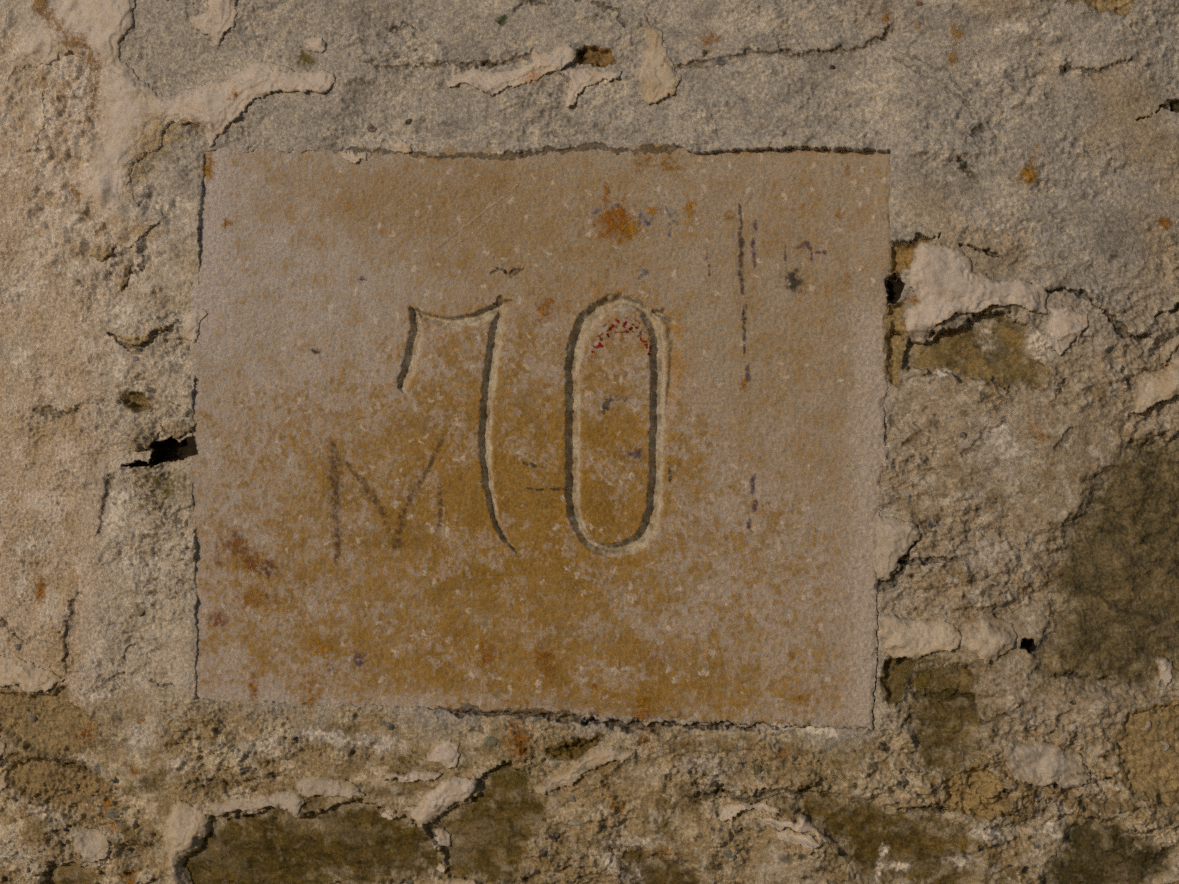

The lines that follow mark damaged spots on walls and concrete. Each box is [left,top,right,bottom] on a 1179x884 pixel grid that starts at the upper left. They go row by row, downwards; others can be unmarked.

flaking render [7,0,335,248]
flaking render [445,45,621,108]
flaking render [636,13,681,105]
flaking render [883,239,1089,392]
flaking render [1130,338,1179,413]
flaking render [1032,431,1179,808]
spalling [0,656,112,806]
flaking render [46,825,112,884]
flaking render [161,733,636,884]
flaking render [615,844,706,884]
flaking render [718,612,1091,884]
flaking render [1041,817,1179,884]